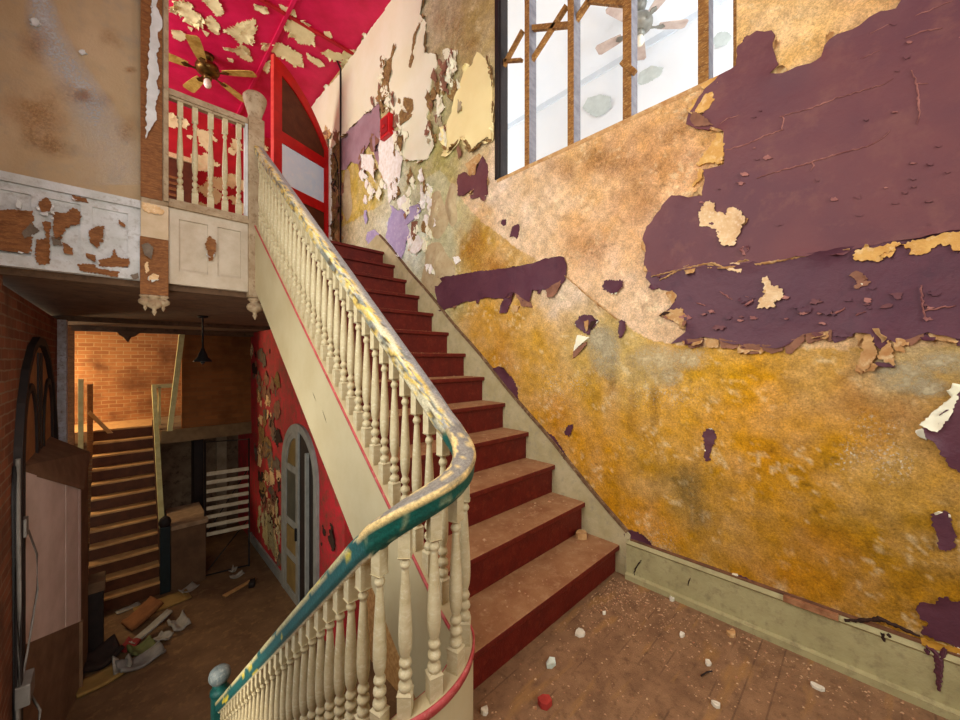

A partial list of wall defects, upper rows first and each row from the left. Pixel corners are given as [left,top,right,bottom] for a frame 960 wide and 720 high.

peeling [142,0,494,261]
peeling [0,195,159,282]
peeling [635,0,960,473]
peeling [425,256,567,314]
flaking render [573,314,626,370]
peeling [250,344,283,566]
peeling [930,510,957,552]
crack [844,616,920,642]
peeling [916,596,960,654]